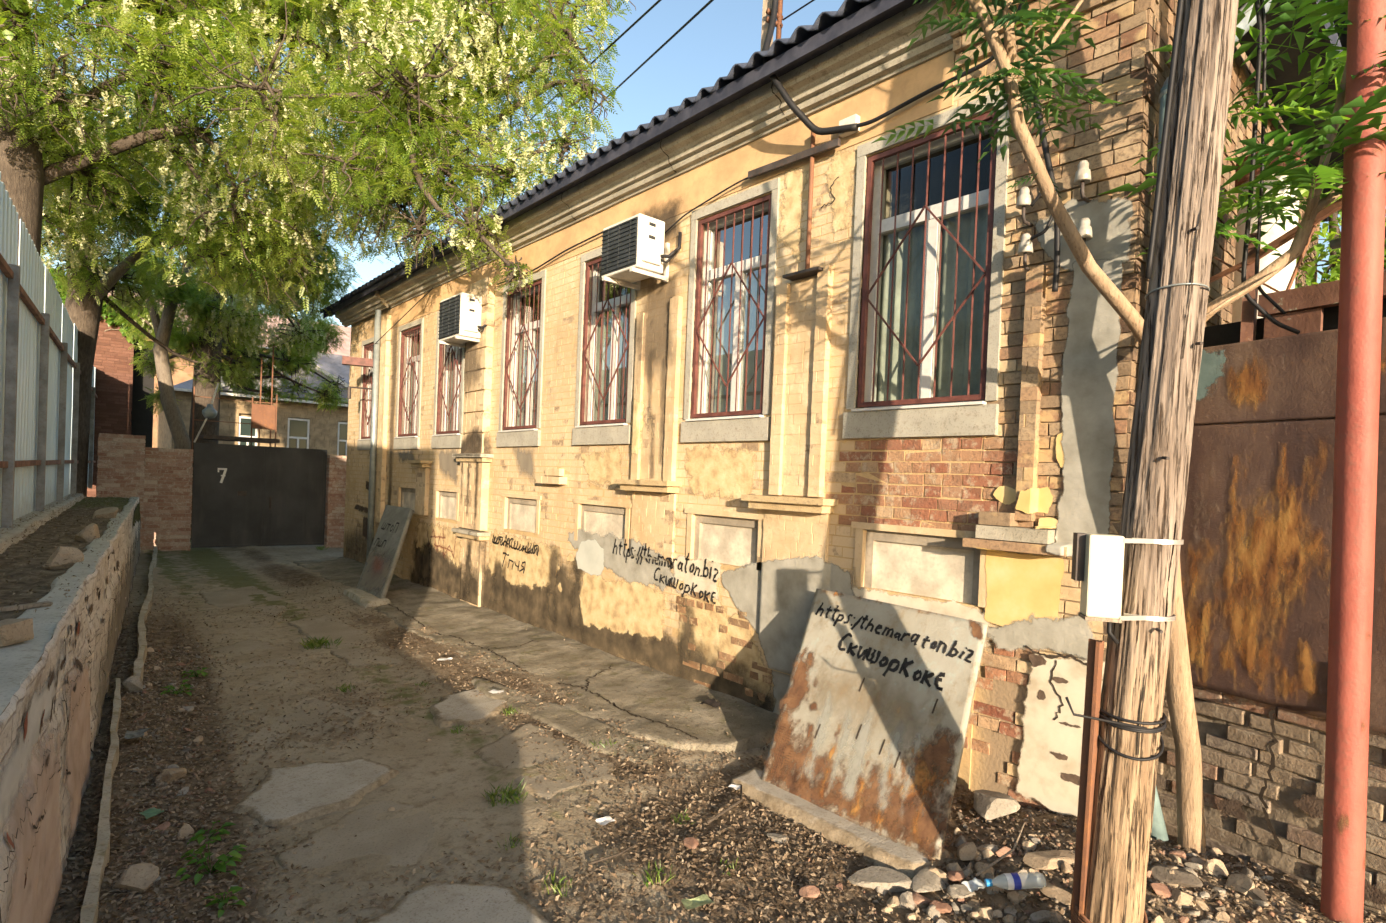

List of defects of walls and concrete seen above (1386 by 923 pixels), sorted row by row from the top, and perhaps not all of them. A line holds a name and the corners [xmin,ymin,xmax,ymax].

flaking render [825,0,1148,817]
rust [1229,359,1268,408]
crack [0,570,123,923]
crack [389,604,531,672]
flaking render [485,529,574,592]
leakage [410,538,774,712]
crack [558,666,698,739]
flaking render [579,573,772,702]
rust [1182,449,1325,696]
crack [1259,709,1283,853]